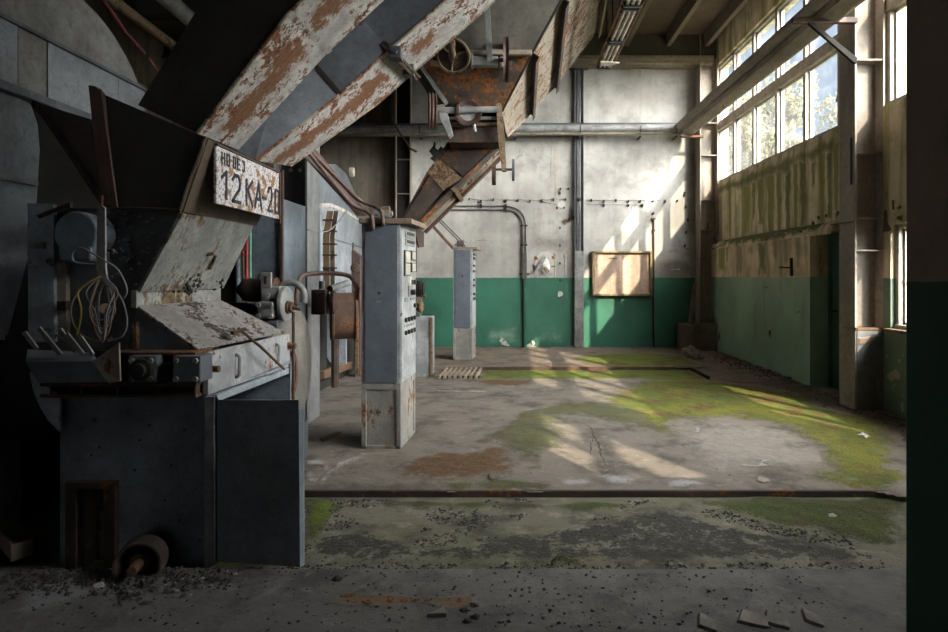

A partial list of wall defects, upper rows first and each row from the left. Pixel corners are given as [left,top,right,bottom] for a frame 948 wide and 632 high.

leakage [718,130,839,278]
crack [588,425,606,465]